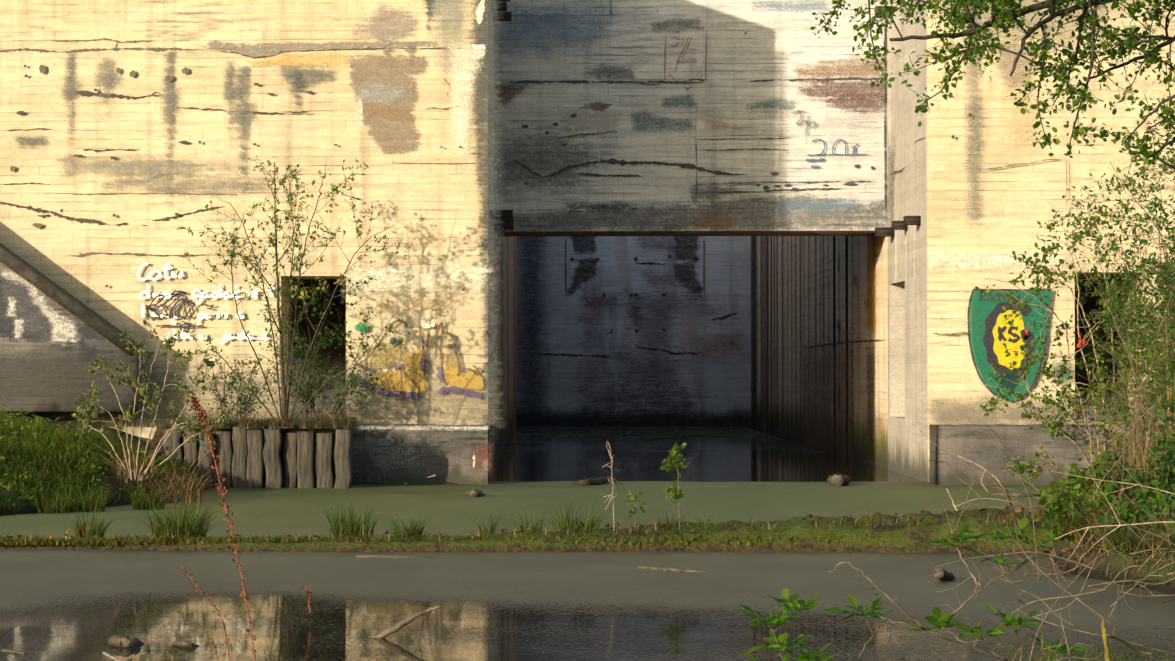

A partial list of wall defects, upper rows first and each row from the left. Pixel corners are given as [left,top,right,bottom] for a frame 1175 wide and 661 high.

water stain [0,0,894,465]